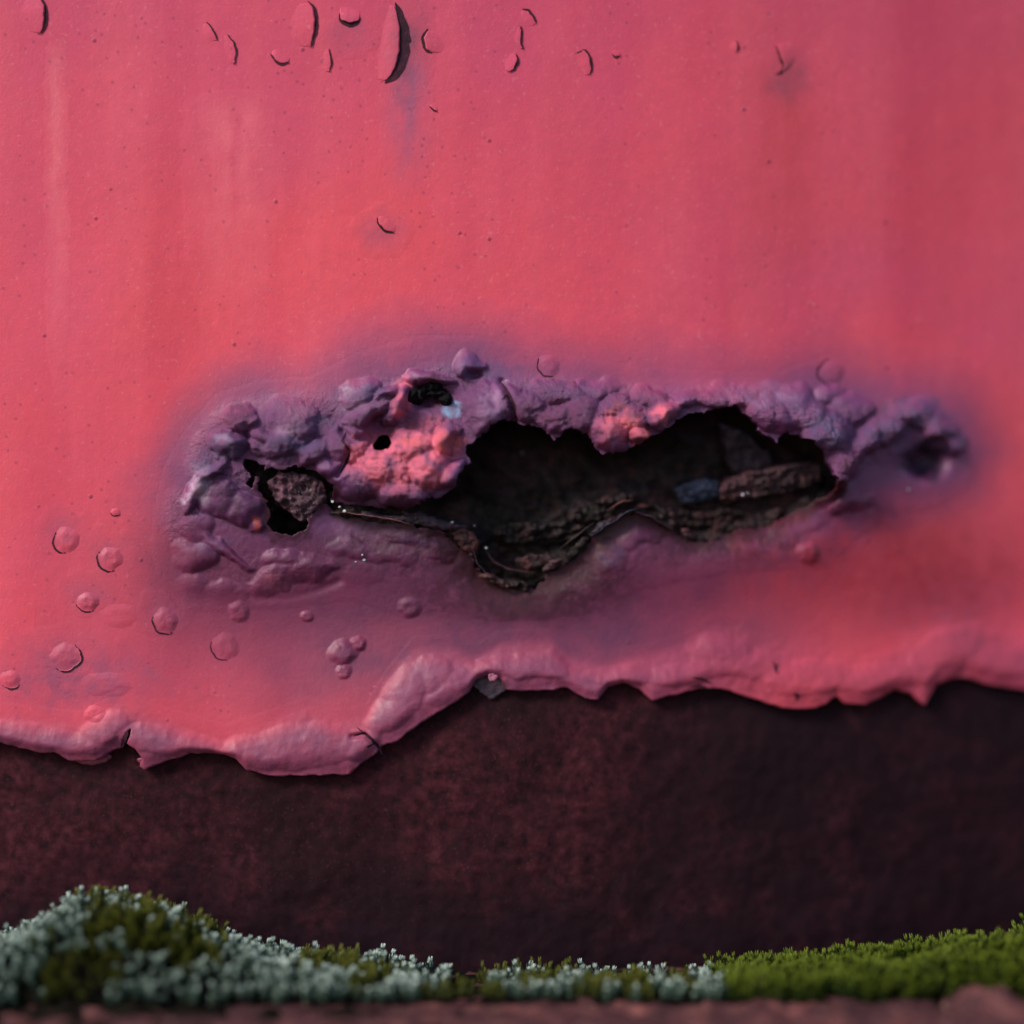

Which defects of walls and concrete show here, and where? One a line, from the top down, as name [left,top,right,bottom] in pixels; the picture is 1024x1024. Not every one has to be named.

peeling [202,22,237,64]
peeling [289,1,332,73]
peeling [339,6,361,27]
peeling [377,2,445,83]
peeling [504,9,536,72]
peeling [573,49,593,76]
spalling [245,405,837,590]
corrosion [361,492,746,591]
peeling [0,602,1024,776]